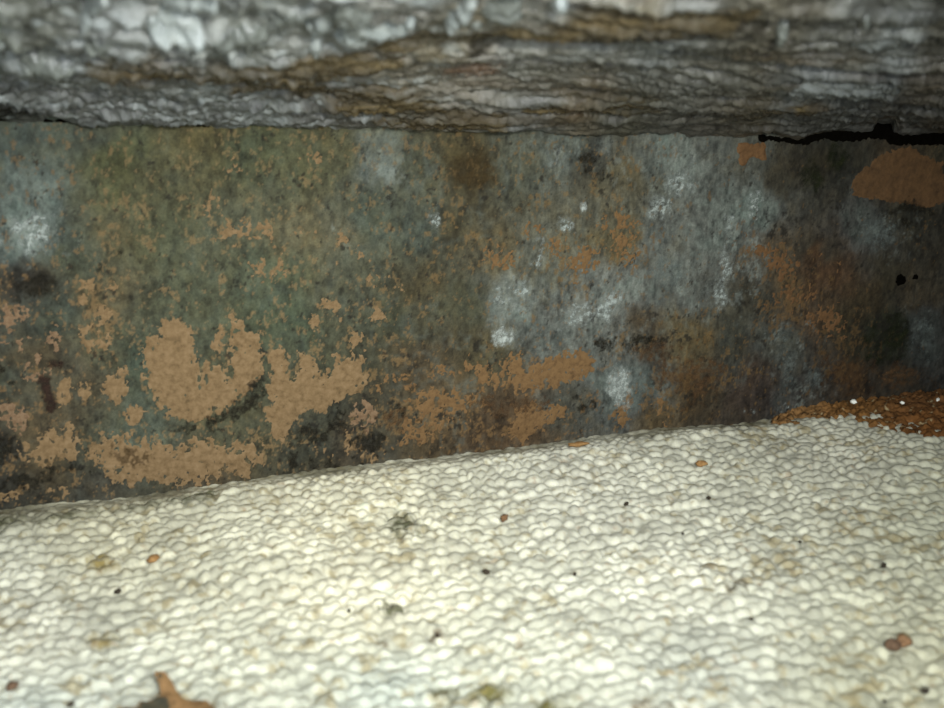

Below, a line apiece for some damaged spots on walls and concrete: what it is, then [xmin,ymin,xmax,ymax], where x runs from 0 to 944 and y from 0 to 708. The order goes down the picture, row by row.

damp [523,104,645,115]
peeling [851,146,944,208]
efflorescence [649,173,692,217]
efflorescence [11,215,48,253]
damp [895,274,918,286]
efflorescence [568,295,622,326]
mould [594,335,664,351]
mould [174,379,265,432]
peeling [0,298,596,489]
damp [609,365,643,400]
mould [347,428,386,459]
peeling [0,484,29,502]